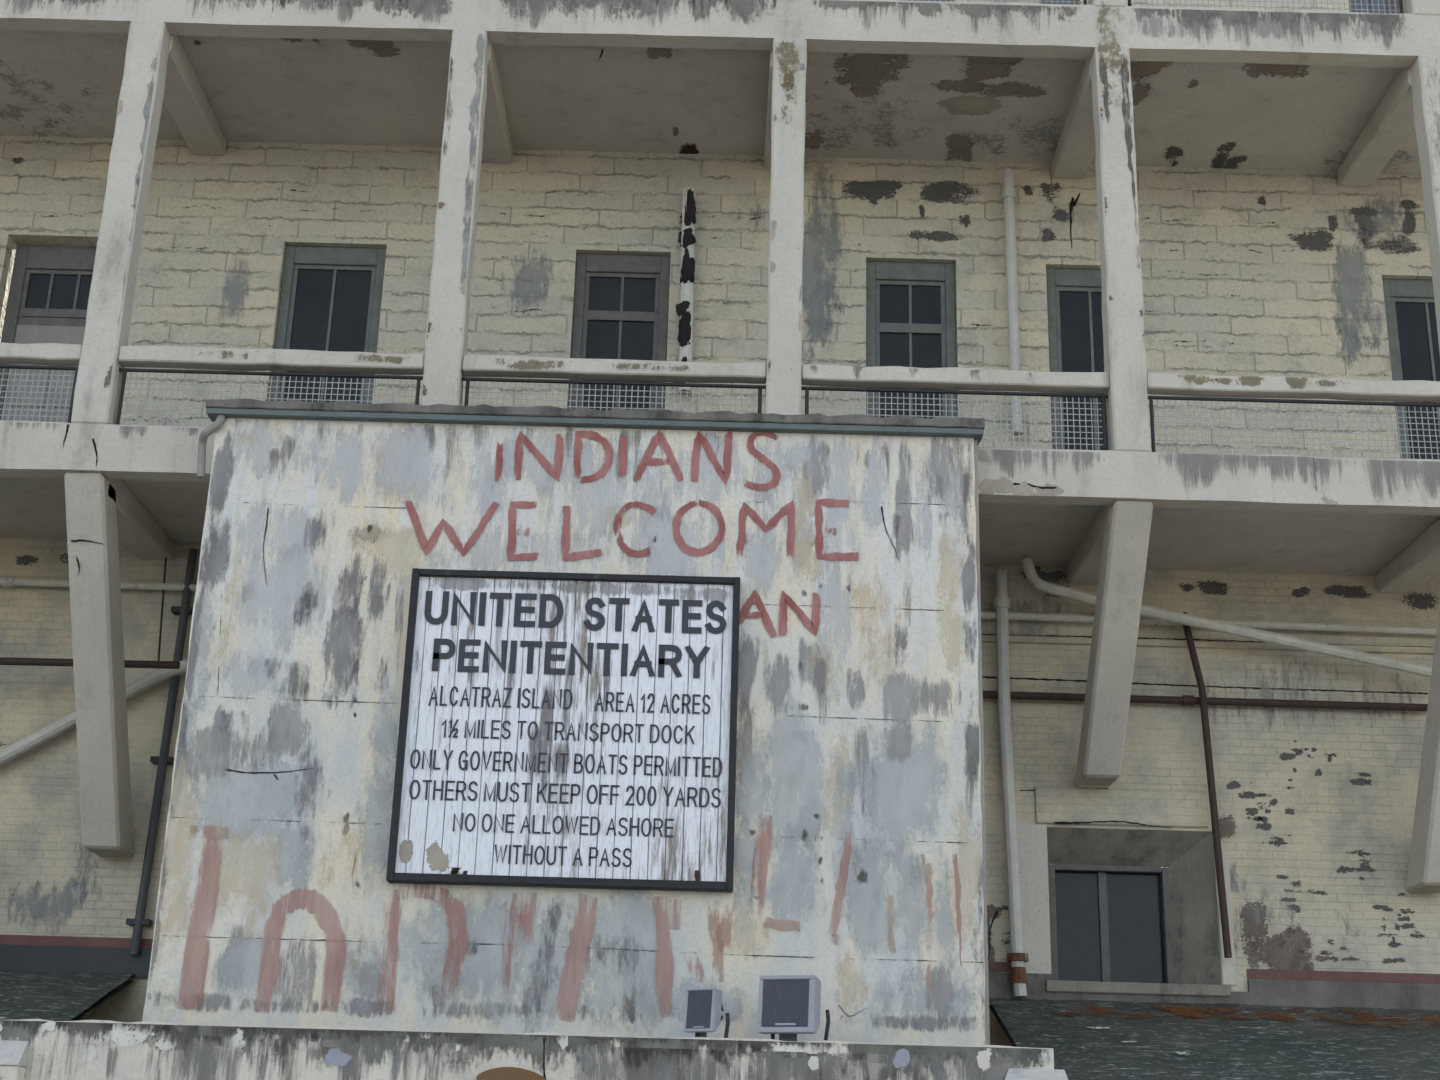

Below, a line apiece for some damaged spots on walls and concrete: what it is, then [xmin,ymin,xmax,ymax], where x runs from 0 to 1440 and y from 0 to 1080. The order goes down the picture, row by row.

water stain [504,0,776,27]
water stain [814,0,1076,29]
water stain [1135,8,1403,47]
peeling [841,180,982,242]
peeling [1287,199,1421,255]
water stain [802,172,841,369]
water stain [170,435,319,840]
crack [225,768,312,780]
peeling [1219,740,1340,847]
peeling [1230,868,1359,971]
peeling [1372,892,1425,963]
water stain [0,1020,1043,1080]